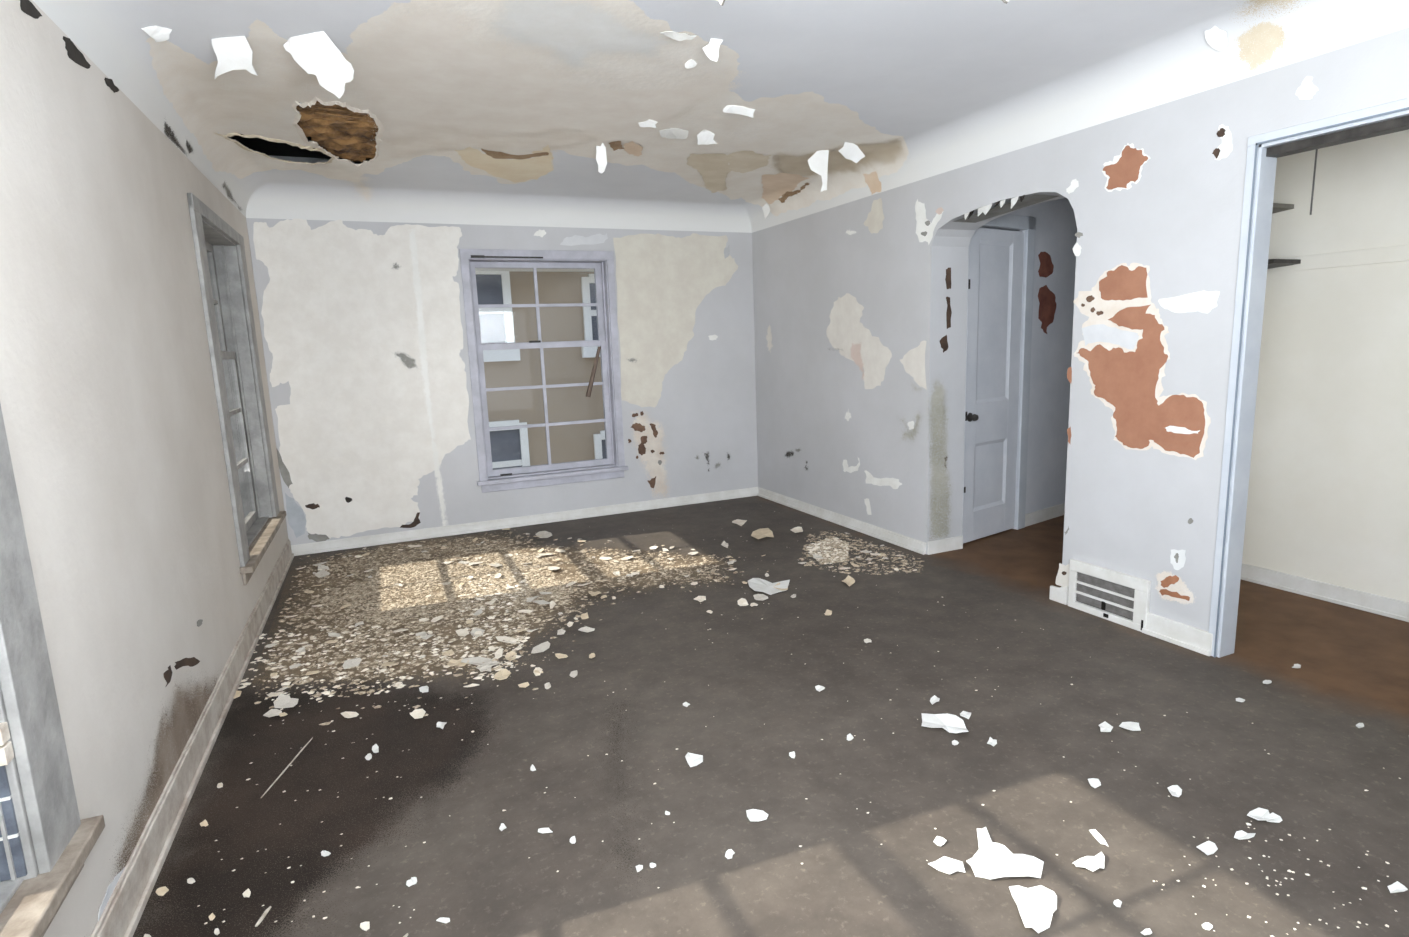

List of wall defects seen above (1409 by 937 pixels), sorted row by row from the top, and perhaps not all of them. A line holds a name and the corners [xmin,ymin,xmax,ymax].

peeling [253,219,471,542]
peeling [141,0,911,236]
peeling [560,233,738,499]
peeling [826,268,952,392]
peeling [1072,232,1083,256]
flaking render [1038,252,1211,460]
flaking render [1102,143,1151,192]
leakage [1205,0,1309,72]